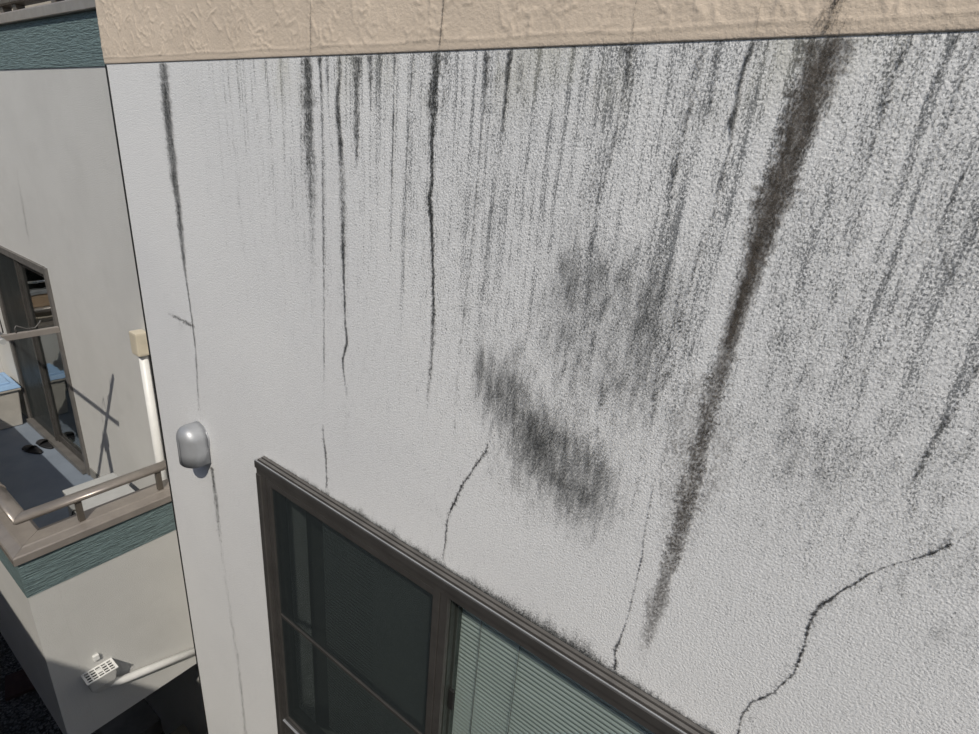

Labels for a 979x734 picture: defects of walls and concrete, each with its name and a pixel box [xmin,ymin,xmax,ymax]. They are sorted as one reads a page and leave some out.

damp [475,51,489,198]
damp [501,50,522,132]
damp [159,63,197,369]
damp [300,56,382,377]
damp [427,52,440,390]
damp [553,250,671,410]
damp [646,37,854,632]
crack [443,444,488,559]
damp [476,340,616,519]
crack [613,541,644,670]
crack [737,539,951,734]